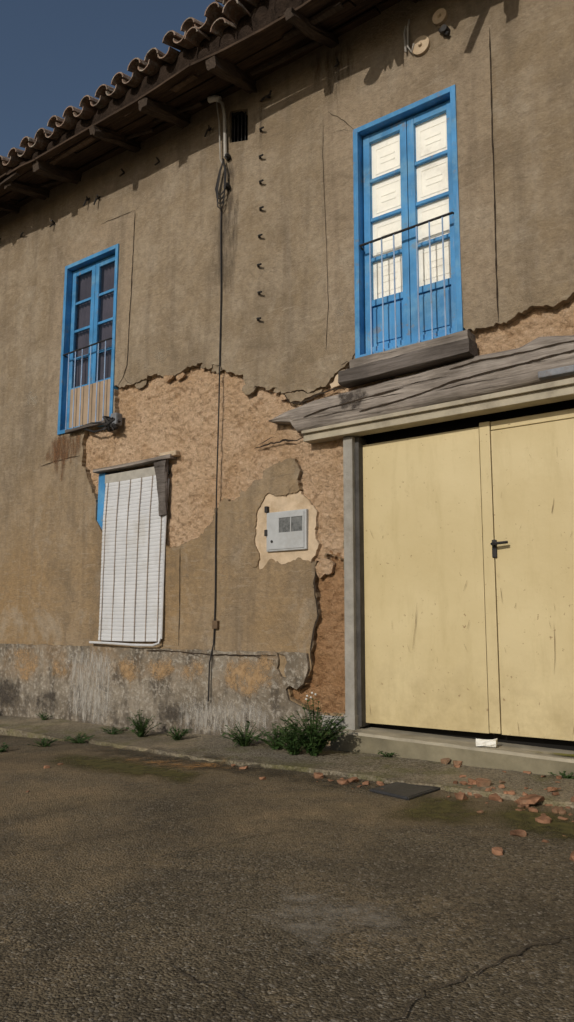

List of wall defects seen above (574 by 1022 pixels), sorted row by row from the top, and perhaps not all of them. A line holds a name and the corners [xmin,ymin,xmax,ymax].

flaking render [471,299,574,356]
flaking render [86,364,396,713]
damp [53,655,134,720]
damp [165,657,272,730]